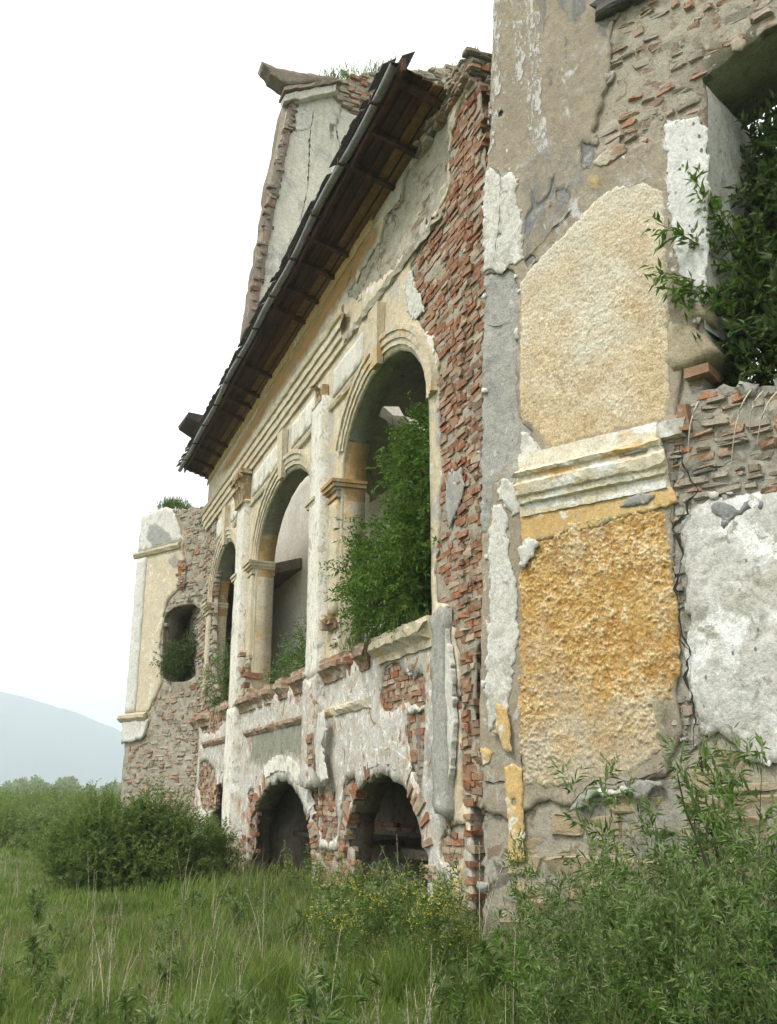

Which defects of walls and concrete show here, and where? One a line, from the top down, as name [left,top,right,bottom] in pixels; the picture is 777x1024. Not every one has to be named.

crack [299,112,340,222]
flaking render [581,0,777,324]
flaking render [122,505,225,835]
flaking render [348,85,777,961]
crack [670,446,737,780]